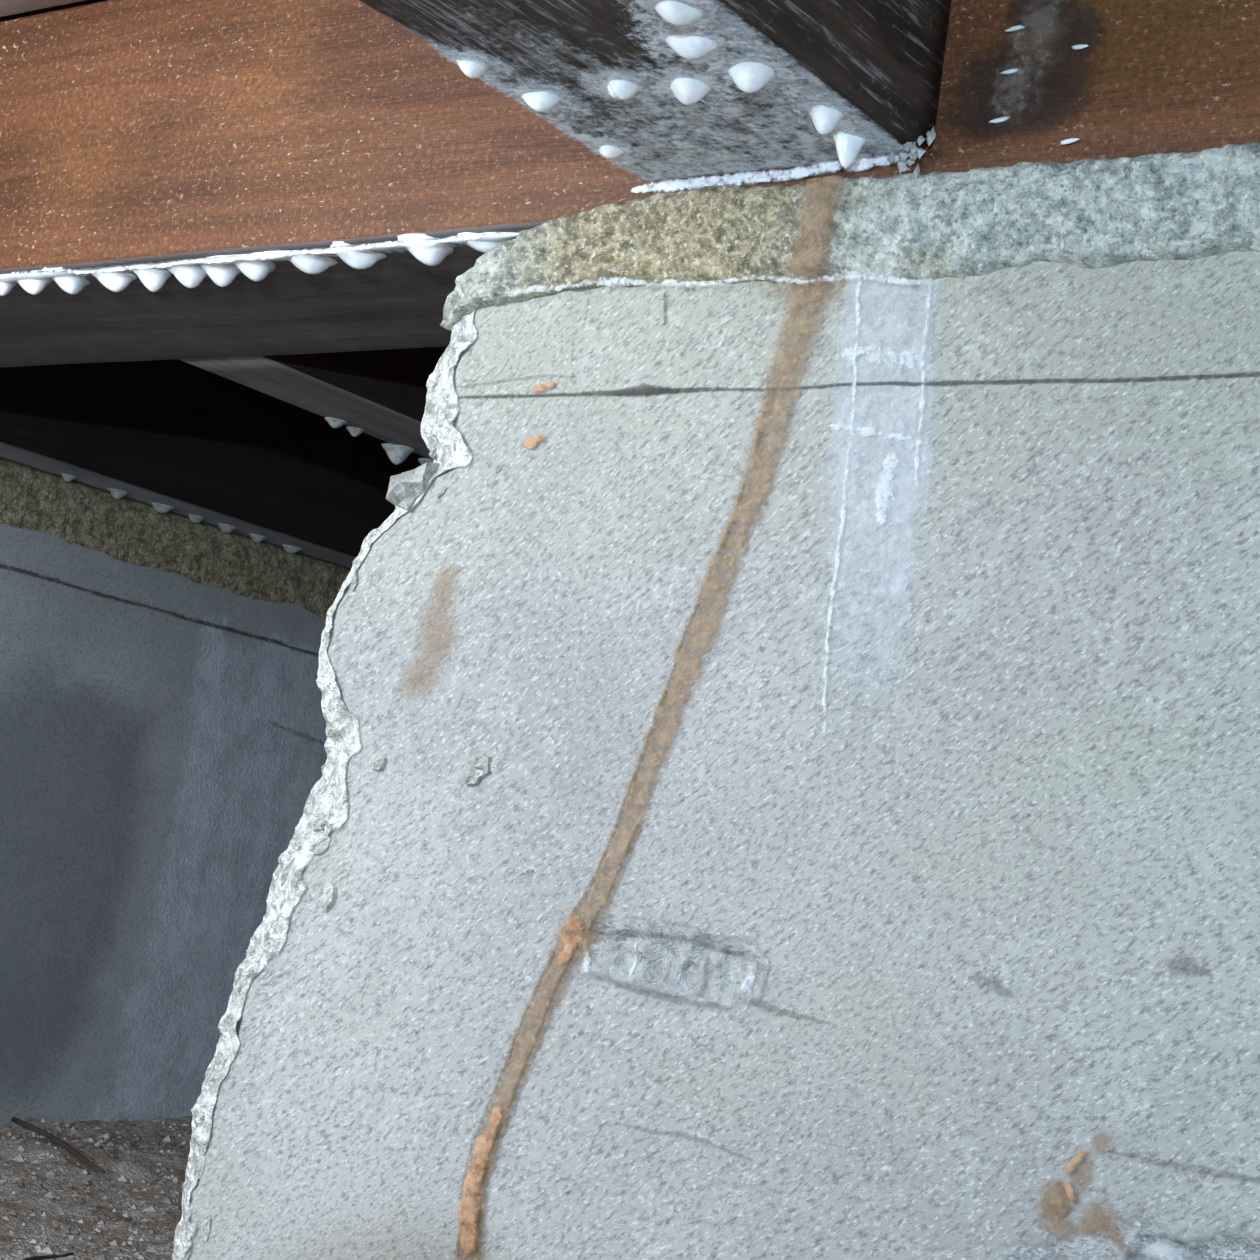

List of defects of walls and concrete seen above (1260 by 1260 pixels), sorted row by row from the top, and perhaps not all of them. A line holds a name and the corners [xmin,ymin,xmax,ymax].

damp [955,0,1102,137]
damp [835,275,926,479]
rust [523,435,544,449]
damp [876,456,895,523]
damp [826,506,845,652]
crack [456,176,1260,1260]
spalling [573,917,769,1010]
rust [1039,1138,1130,1254]
spalling [996,1218,1260,1260]